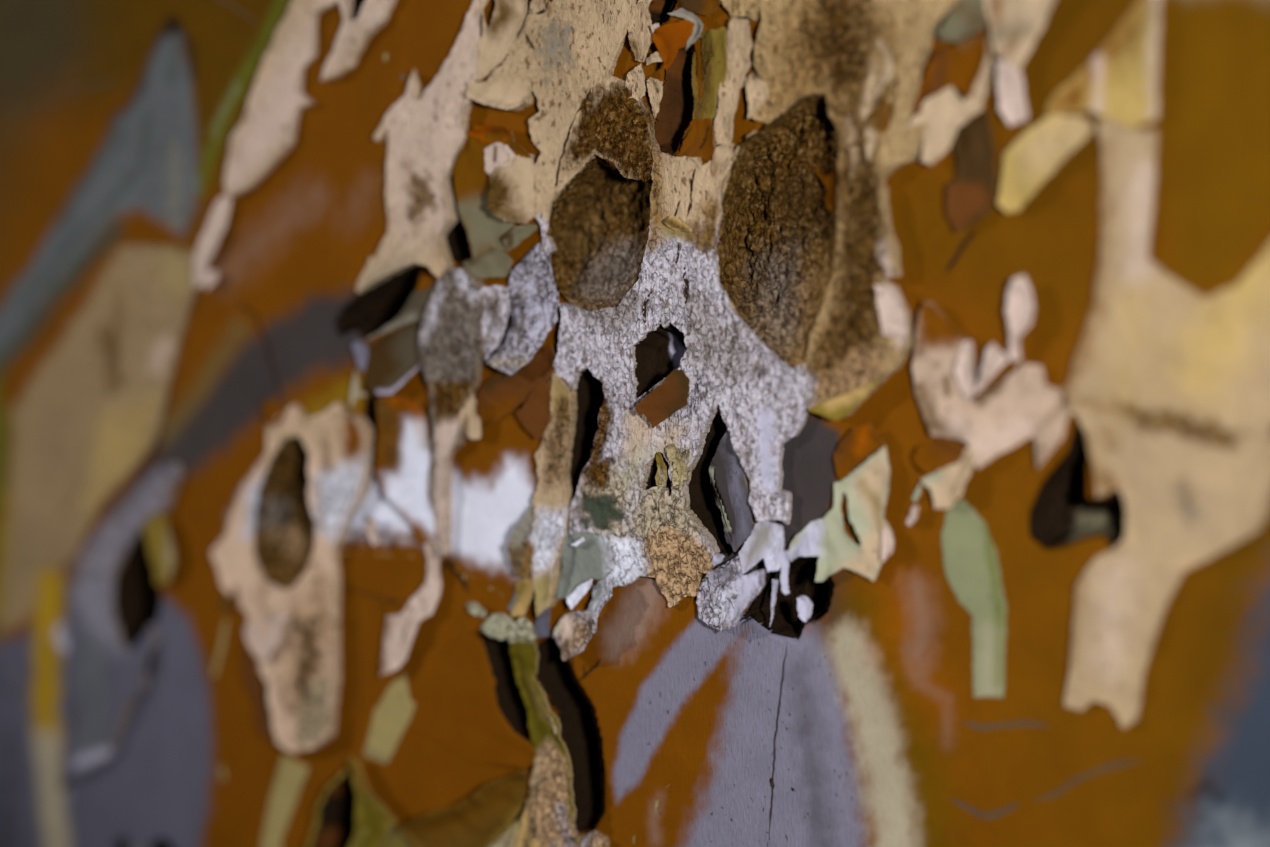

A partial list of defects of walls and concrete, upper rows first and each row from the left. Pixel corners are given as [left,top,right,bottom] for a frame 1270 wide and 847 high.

peeling [50,0,396,780]
peeling [306,0,1270,847]